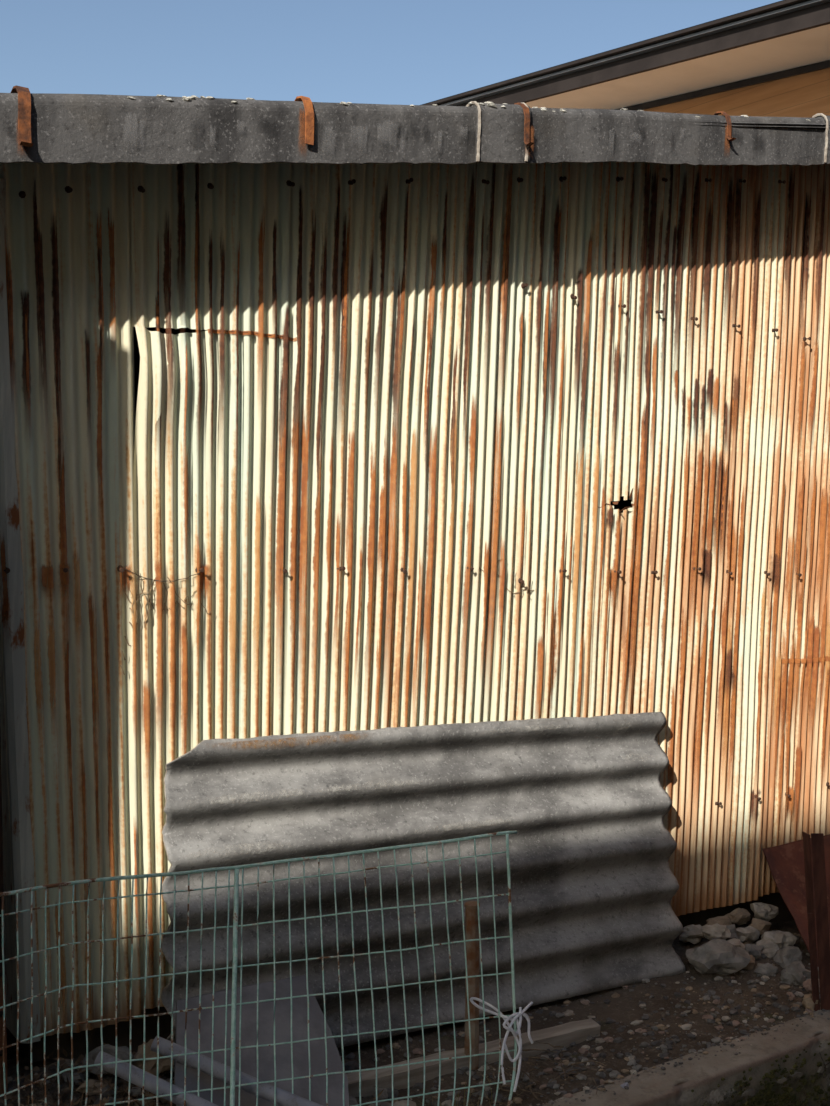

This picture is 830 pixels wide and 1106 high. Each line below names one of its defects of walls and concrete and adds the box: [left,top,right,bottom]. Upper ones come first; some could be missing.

corrosion [725,180,742,303]
corrosion [753,193,761,331]
corrosion [785,172,826,311]
corrosion [120,164,448,760]
corrosion [446,163,513,677]
corrosion [536,164,713,709]
corrosion [798,346,830,430]
corrosion [662,369,744,789]
corrosion [756,475,830,812]
corrosion [750,790,760,817]
corrosion [134,825,154,970]